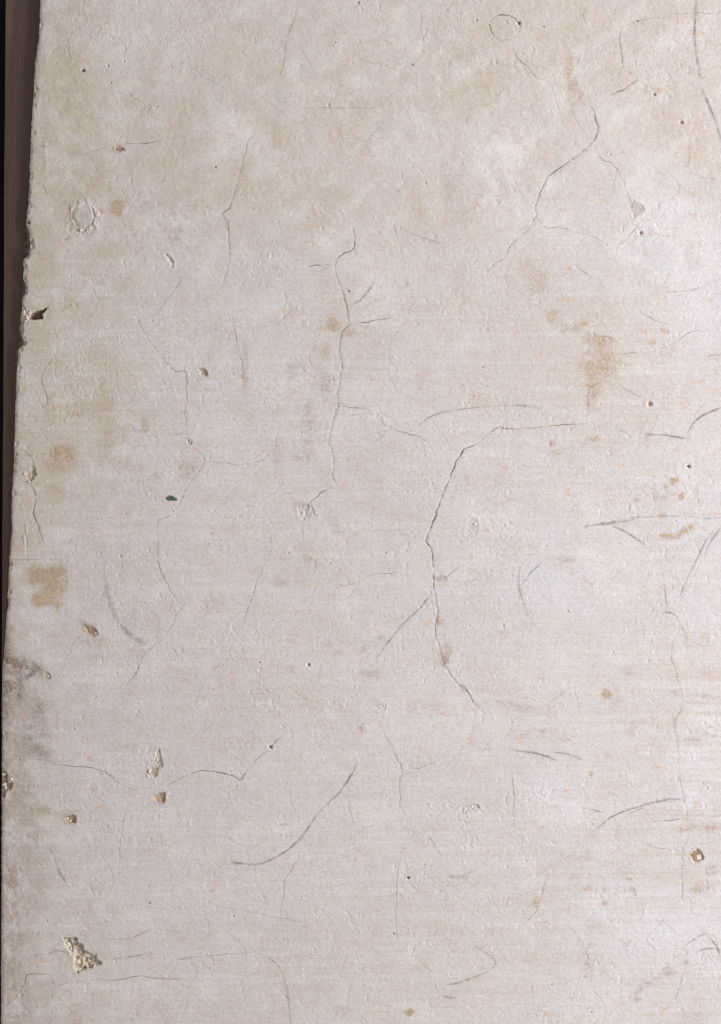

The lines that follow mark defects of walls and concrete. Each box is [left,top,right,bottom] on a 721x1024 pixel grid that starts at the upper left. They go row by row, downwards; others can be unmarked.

spalling [146,750,165,803]
spalling [690,849,704,862]
spalling [63,938,101,973]